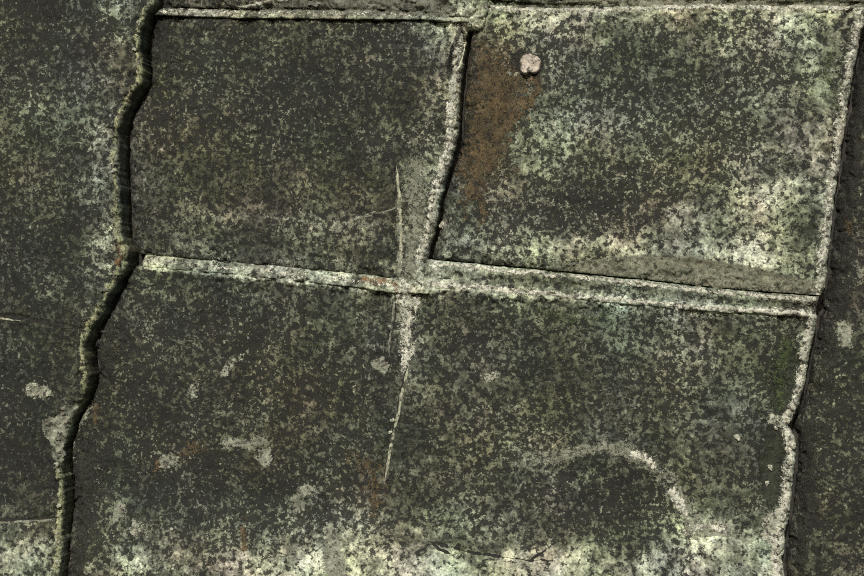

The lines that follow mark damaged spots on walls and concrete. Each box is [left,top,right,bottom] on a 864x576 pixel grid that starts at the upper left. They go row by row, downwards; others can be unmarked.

crack [362,166,404,273]
crack [382,296,409,484]